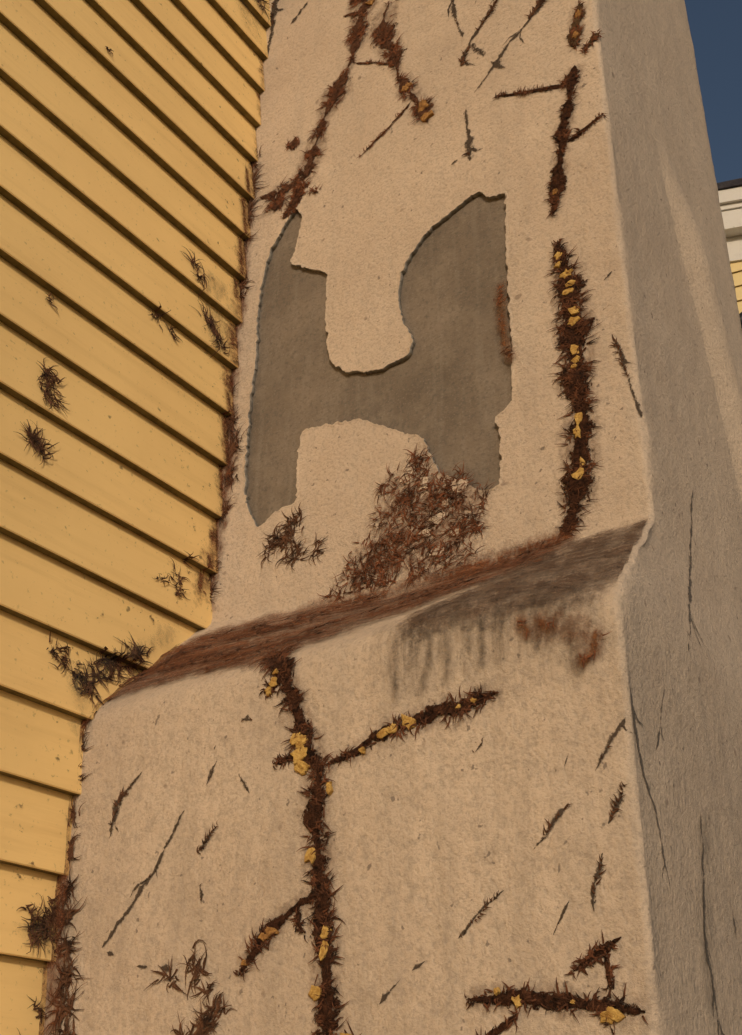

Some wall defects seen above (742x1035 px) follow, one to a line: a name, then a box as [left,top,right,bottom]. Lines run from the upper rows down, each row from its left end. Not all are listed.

crack [260,0,435,220]
crack [447,0,643,542]
spalling [243,190,515,604]
corrosion [96,520,586,706]
leakage [394,520,647,686]
corrosion [516,613,610,668]
crack [233,642,504,1035]
corrosion [39,860,69,1035]
crack [464,853,649,1035]